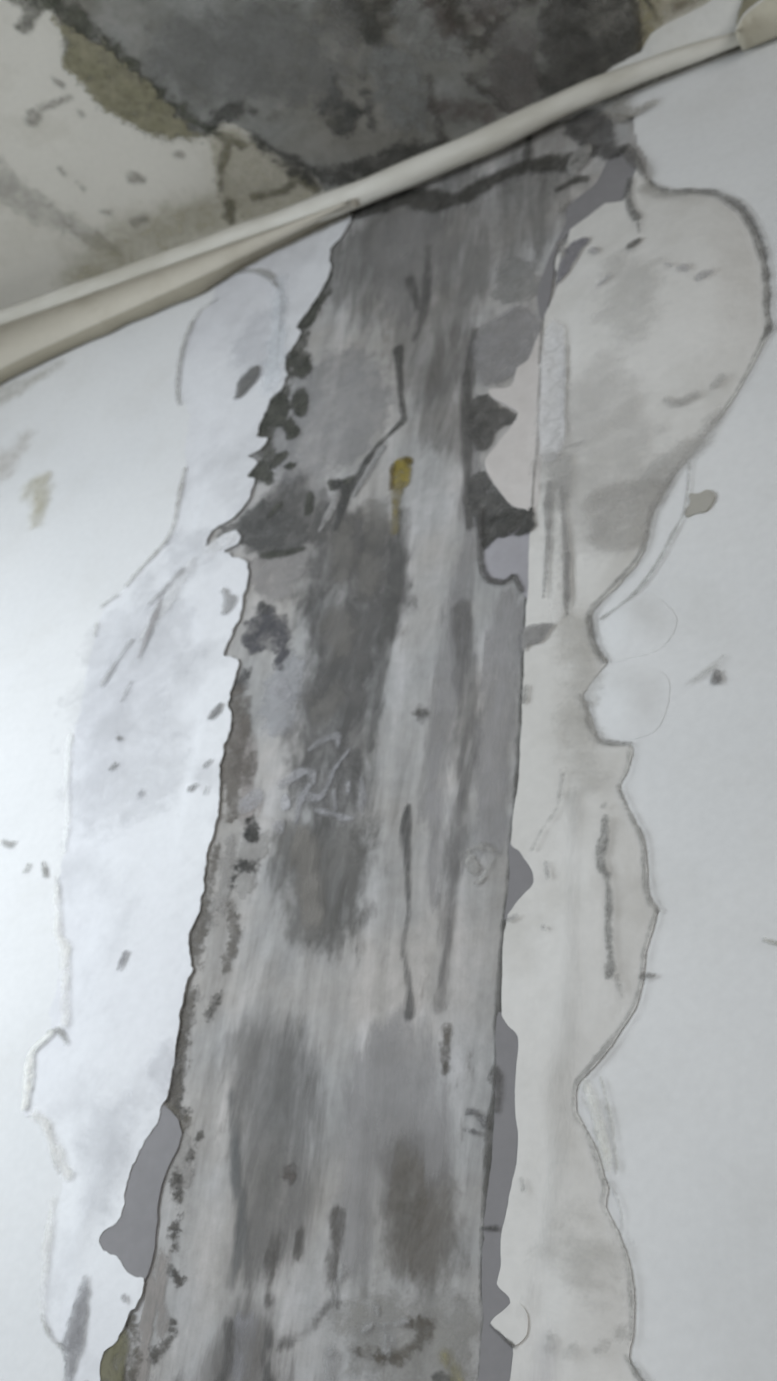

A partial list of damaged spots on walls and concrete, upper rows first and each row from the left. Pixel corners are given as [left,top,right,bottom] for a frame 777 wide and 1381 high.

water stain [10,0,247,225]
water stain [250,172,320,200]
water stain [207,212,350,290]
peeling [23,111,647,1381]
water stain [281,750,352,823]
water stain [100,1331,128,1381]